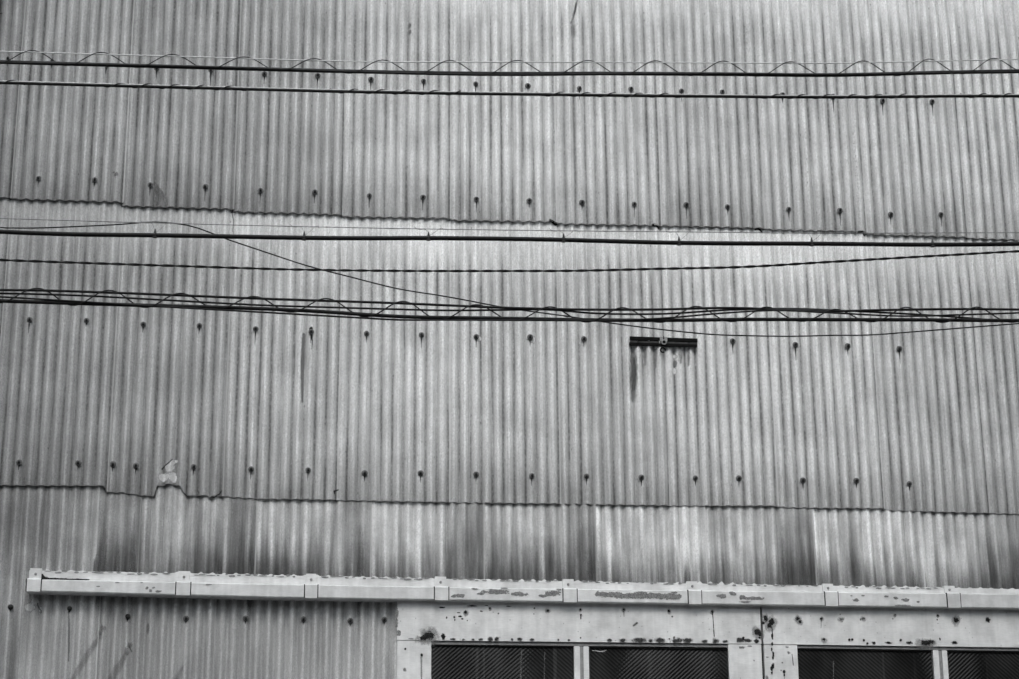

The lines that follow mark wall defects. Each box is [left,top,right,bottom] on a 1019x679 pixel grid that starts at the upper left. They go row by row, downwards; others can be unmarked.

damp [631,349,657,401]
peeling [582,580,682,600]
corrosion [607,610,794,679]